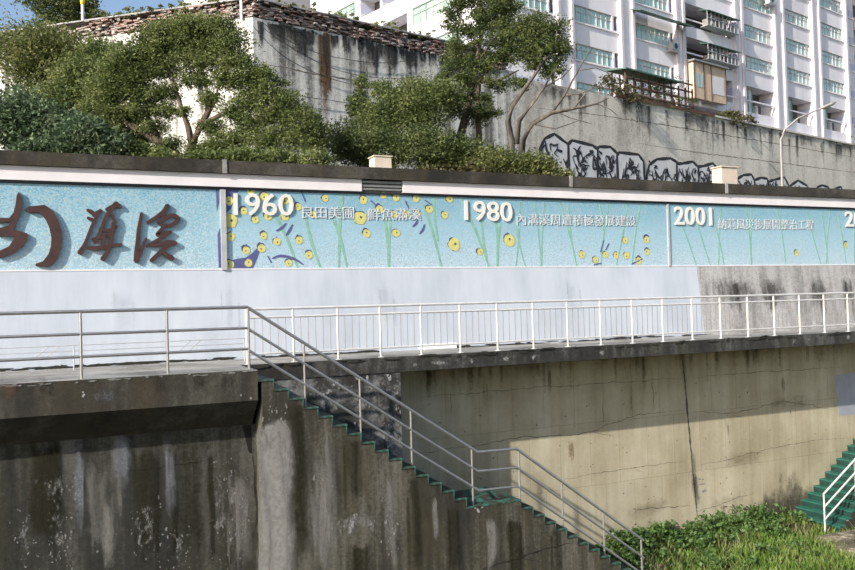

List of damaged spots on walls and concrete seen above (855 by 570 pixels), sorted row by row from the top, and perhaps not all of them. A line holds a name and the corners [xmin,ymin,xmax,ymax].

damp [258,20,457,114]
damp [75,456,113,563]
damp [114,441,128,504]
damp [154,454,178,544]
damp [228,477,248,558]
damp [302,447,372,565]
crack [422,355,844,520]